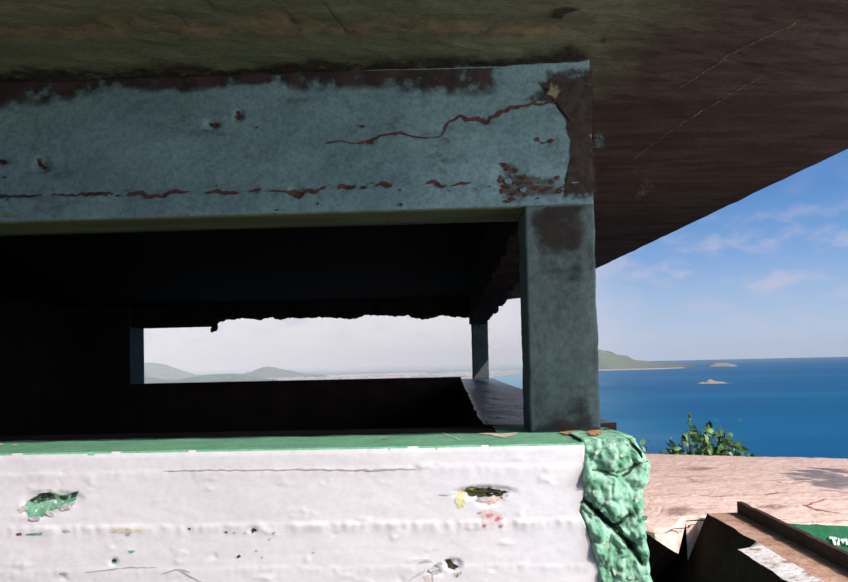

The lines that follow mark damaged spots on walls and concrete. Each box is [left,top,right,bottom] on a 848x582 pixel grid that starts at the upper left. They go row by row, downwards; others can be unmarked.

water stain [0,47,585,106]
crack [327,91,564,144]
spalling [18,489,78,521]
spalling [439,486,509,508]